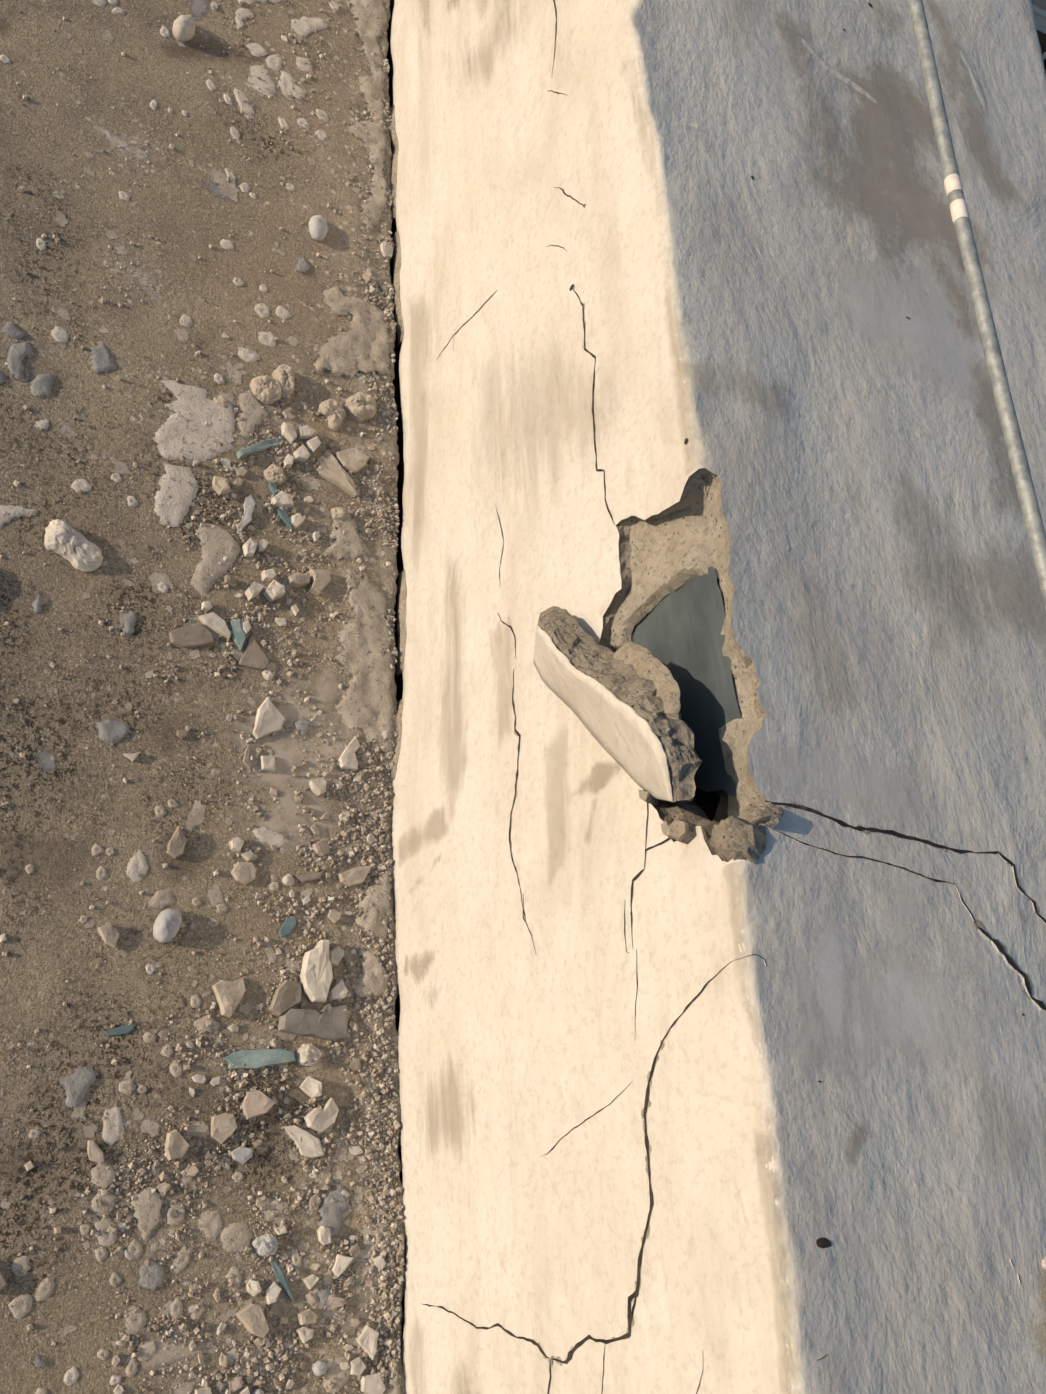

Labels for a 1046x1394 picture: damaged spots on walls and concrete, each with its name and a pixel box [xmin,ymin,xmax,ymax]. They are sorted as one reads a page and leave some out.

crack [547,0,566,95]
crack [554,187,585,208]
crack [437,291,497,359]
crack [573,287,615,525]
crack [495,505,504,580]
spalling [599,468,767,861]
crack [497,613,536,953]
crack [765,800,1046,1013]
crack [423,803,766,1394]